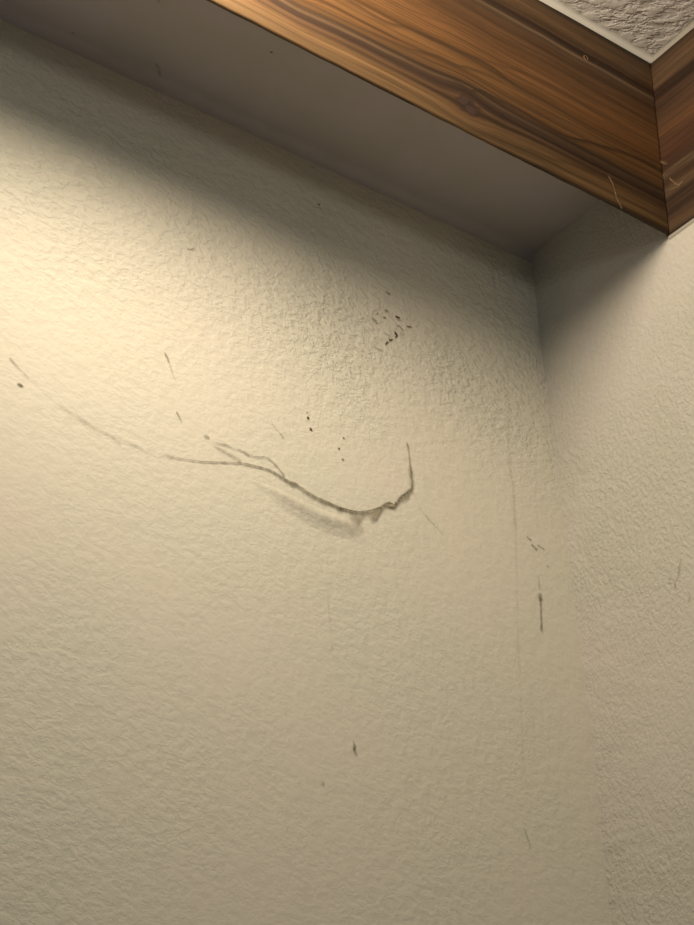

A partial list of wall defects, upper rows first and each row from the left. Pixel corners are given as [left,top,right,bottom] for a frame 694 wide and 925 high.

crack [210,444,412,514]